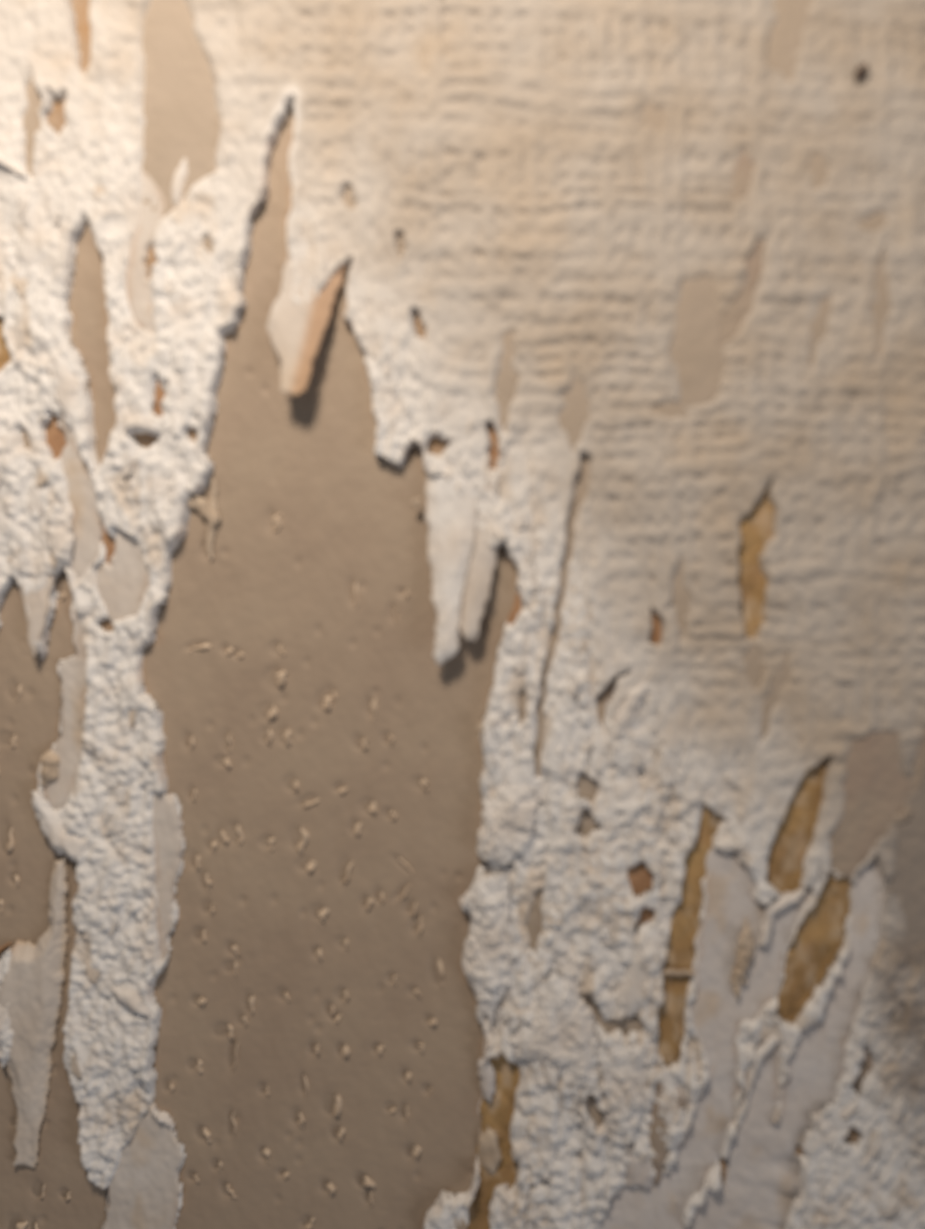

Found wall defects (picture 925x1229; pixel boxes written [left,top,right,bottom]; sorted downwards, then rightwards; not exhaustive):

peeling [126,0,221,334]
peeling [0,106,611,1229]
peeling [596,731,911,1229]